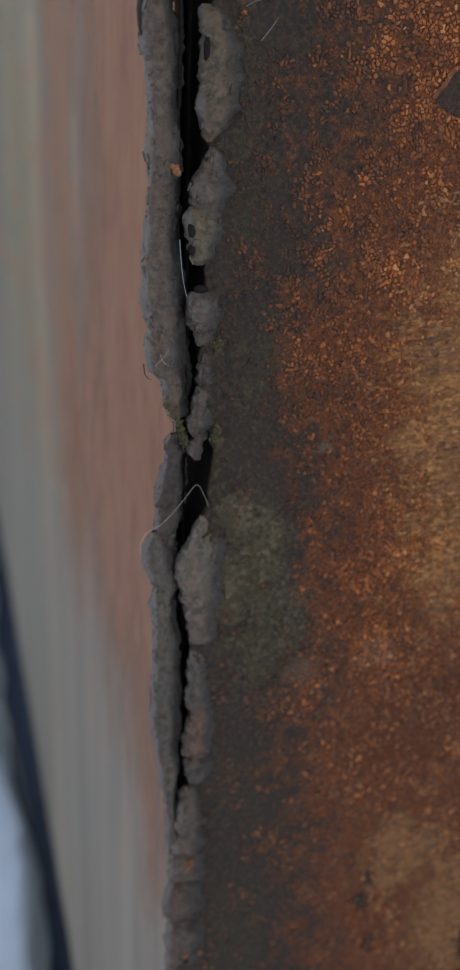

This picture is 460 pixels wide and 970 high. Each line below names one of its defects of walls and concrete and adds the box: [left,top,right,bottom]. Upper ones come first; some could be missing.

crack [180,0,212,294]
rust [73,0,173,837]
crack [176,326,212,554]
rust [211,0,460,732]
crack [176,588,190,801]